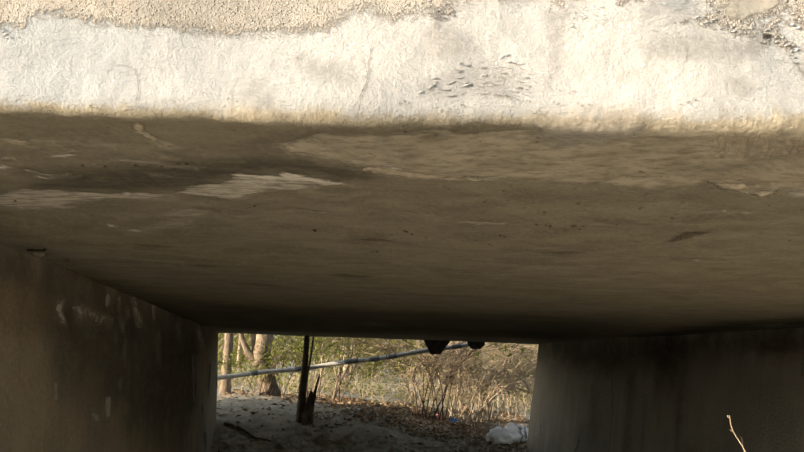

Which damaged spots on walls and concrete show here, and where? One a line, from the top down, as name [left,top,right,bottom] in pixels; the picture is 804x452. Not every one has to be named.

spalling [0,0,466,41]
spalling [664,0,804,60]
crack [355,37,373,131]